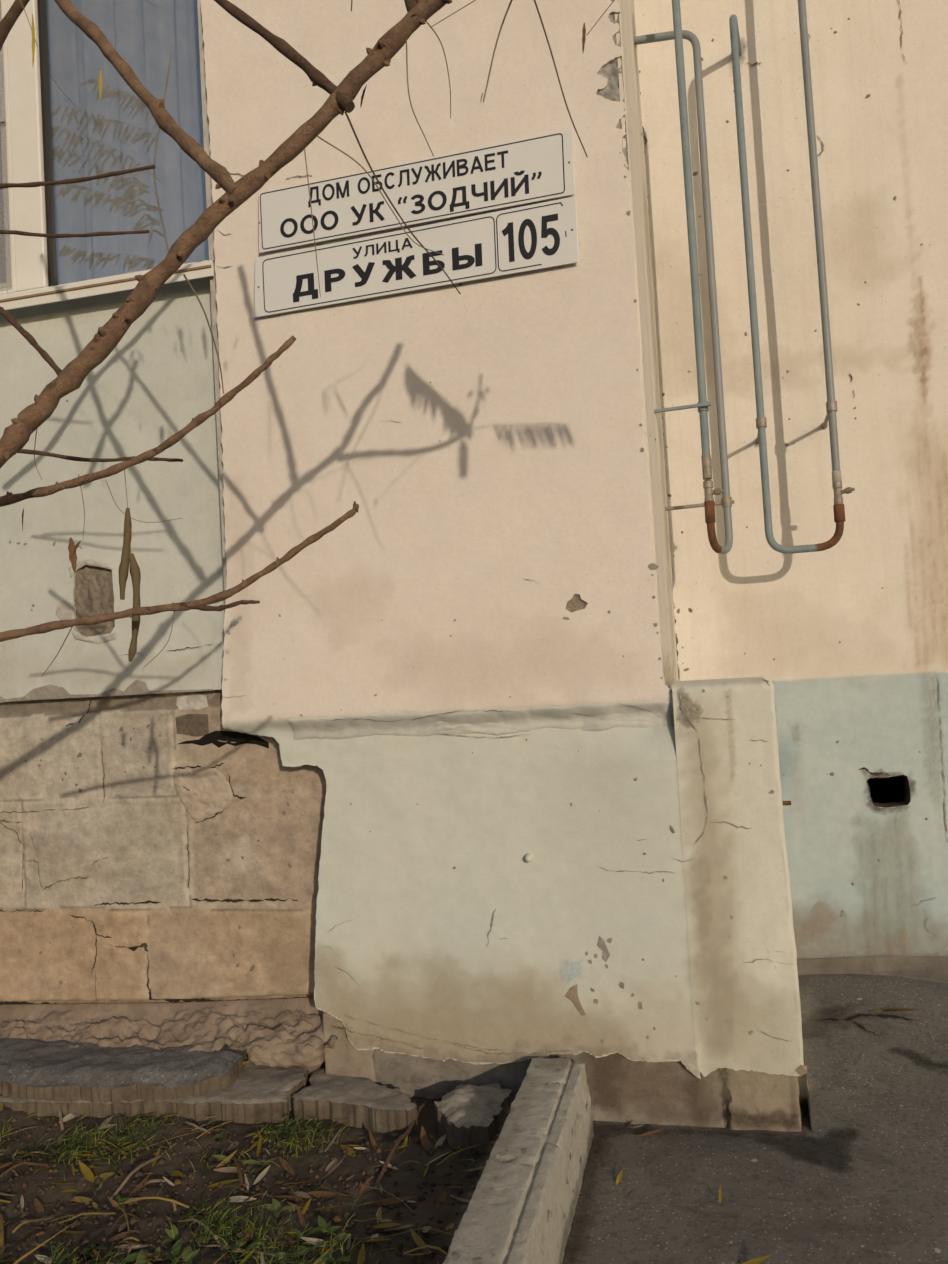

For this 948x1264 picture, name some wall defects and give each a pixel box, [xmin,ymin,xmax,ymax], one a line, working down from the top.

spalling [596,0,642,178]
spalling [563,594,588,620]
crack [0,699,306,1003]
crack [0,999,57,1007]